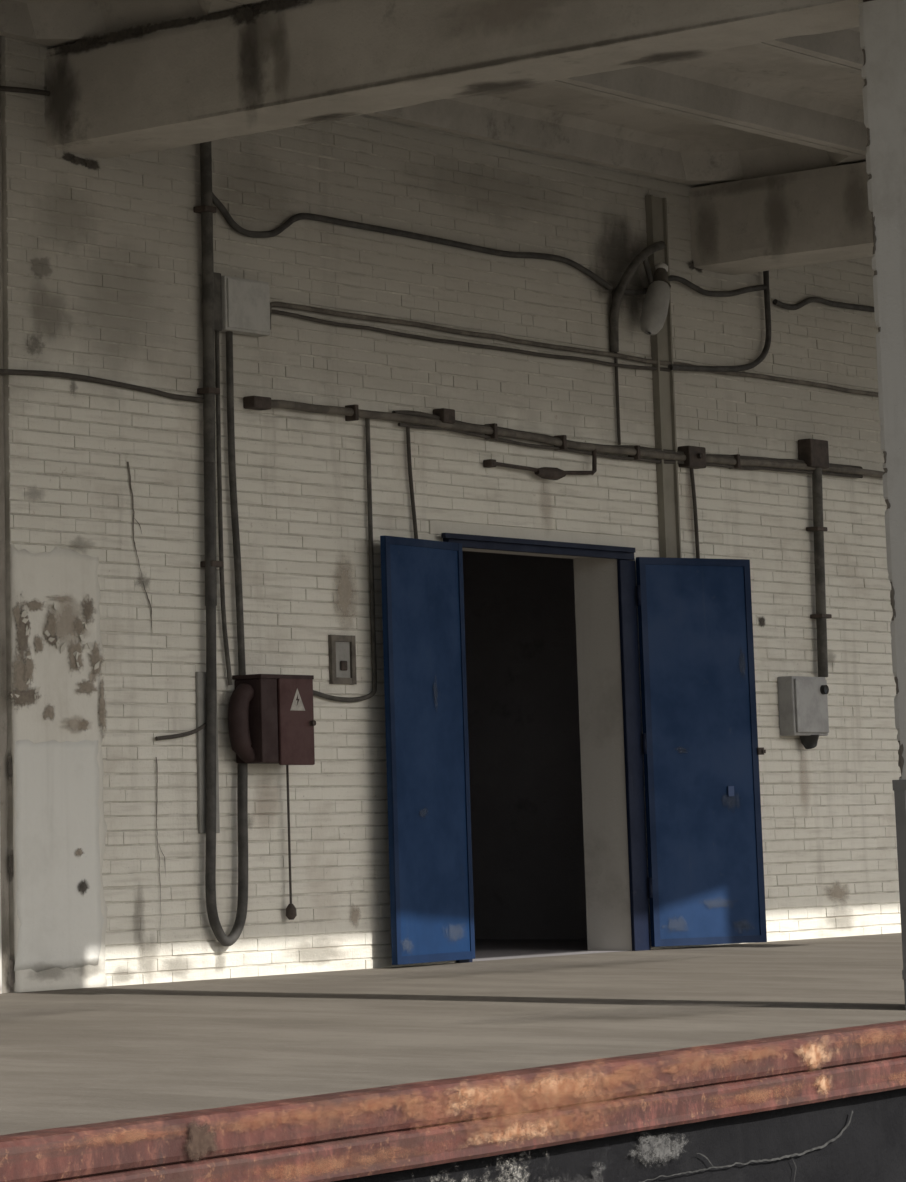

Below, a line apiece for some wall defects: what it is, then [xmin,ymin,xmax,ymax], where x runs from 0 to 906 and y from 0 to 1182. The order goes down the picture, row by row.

water stain [241,32,258,90]
crack [127,462,152,628]
flaking render [11,597,107,738]
corrosion [446,1075,623,1113]
corrosion [800,1045,830,1091]
corrosion [475,1120,552,1141]
crack [643,1110,853,1182]